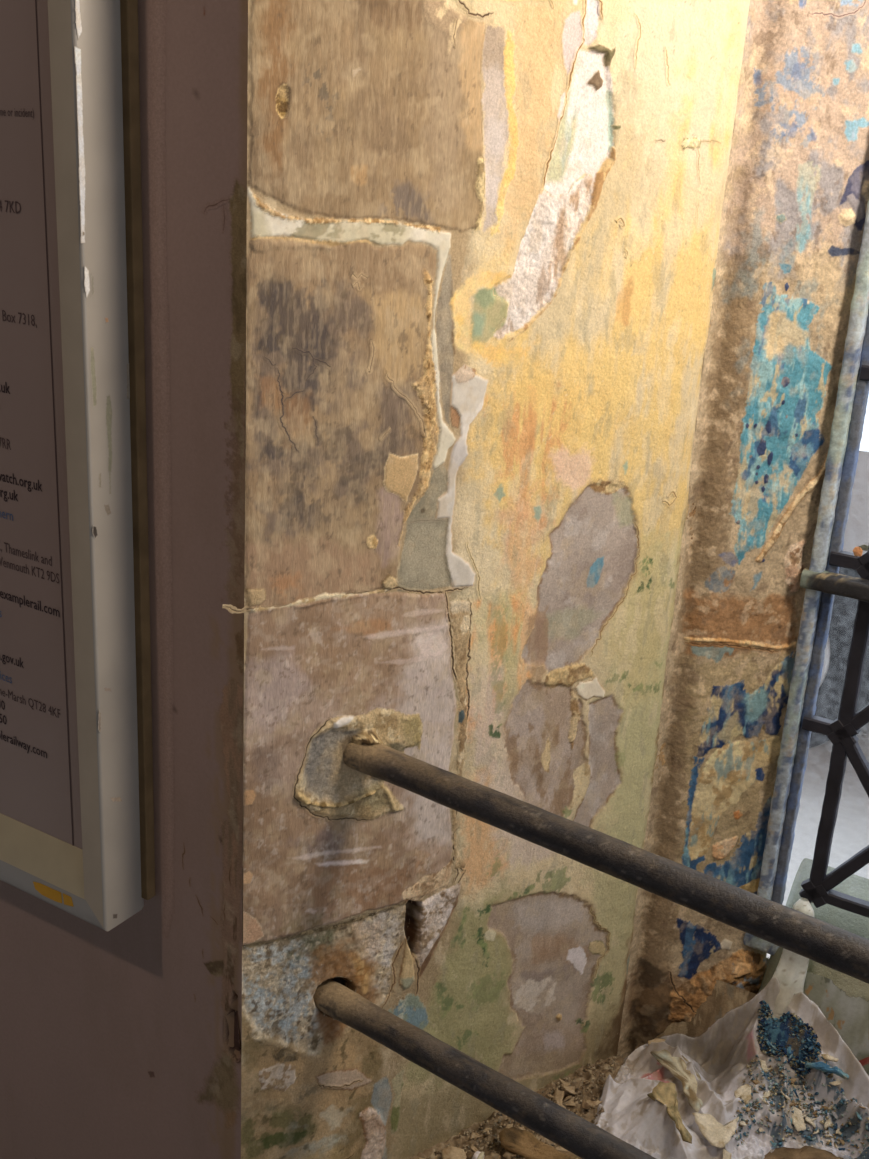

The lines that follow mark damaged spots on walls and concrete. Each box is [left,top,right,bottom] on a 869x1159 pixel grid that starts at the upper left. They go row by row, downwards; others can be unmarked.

crack [451,0,494,49]
peeling [493,0,622,343]
peeling [727,42,869,566]
flaking render [182,0,520,1159]
crack [222,541,483,777]
crack [451,809,467,886]
flaking render [680,650,796,894]
flaking render [782,539,808,595]
corrosion [298,932,386,1050]